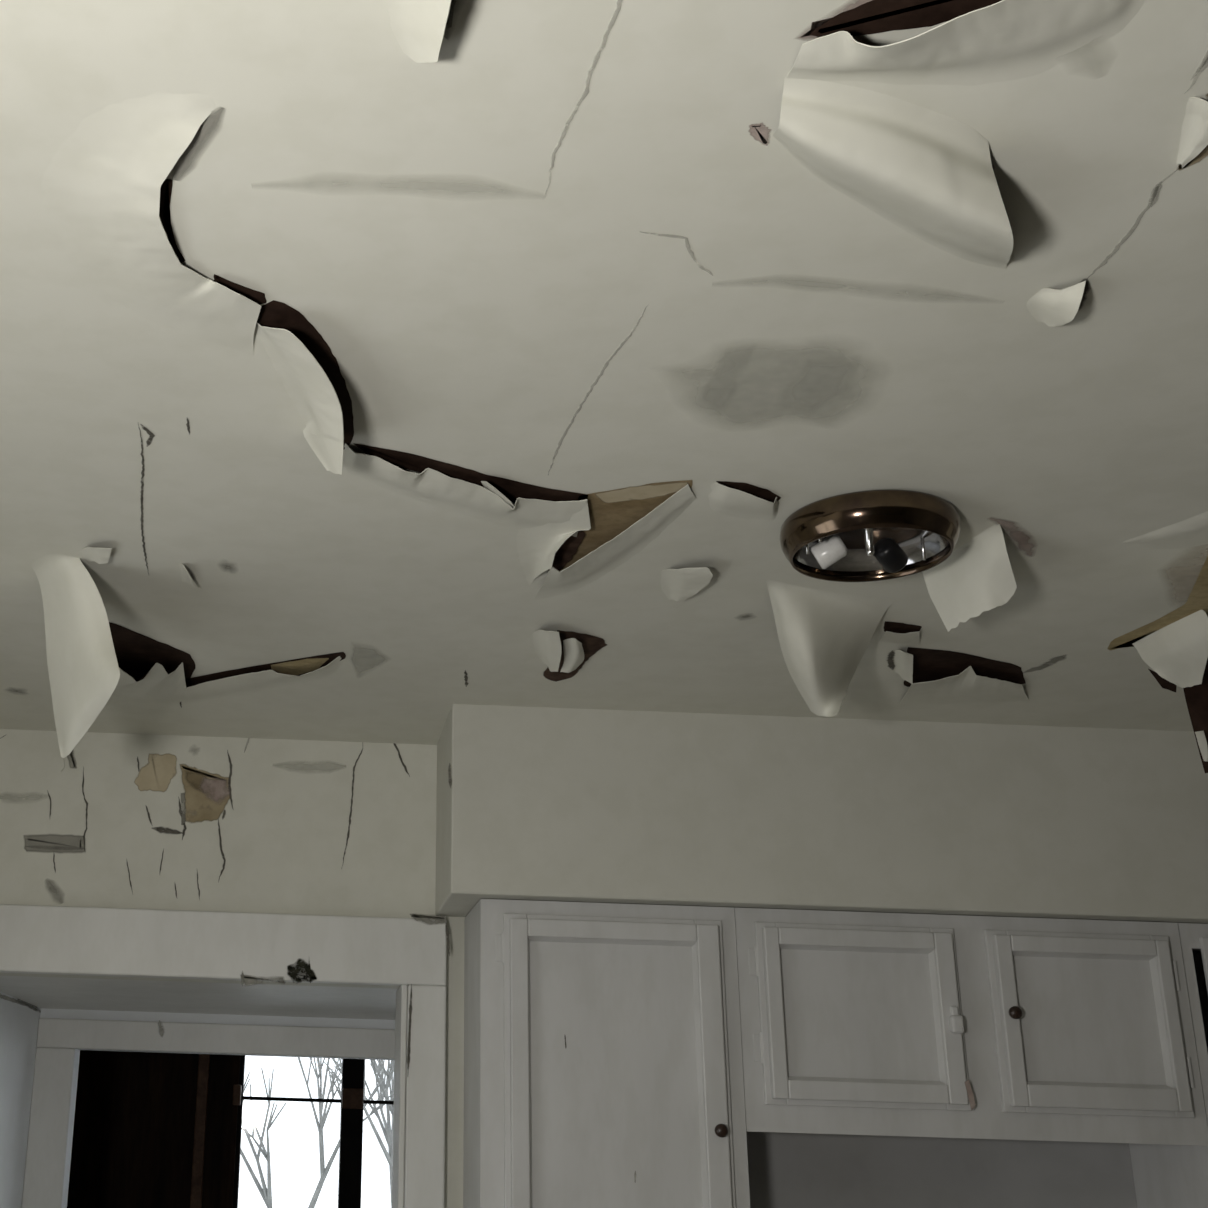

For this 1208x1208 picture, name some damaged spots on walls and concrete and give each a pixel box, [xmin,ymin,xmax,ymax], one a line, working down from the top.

peeling [387,0,457,63]
crack [552,0,622,166]
peeling [749,0,1145,269]
peeling [41,91,781,601]
damp [692,349,857,421]
crack [138,424,155,574]
peeling [30,547,346,771]
peeling [765,578,1065,717]
peeling [922,518,1034,632]
crack [81,766,89,849]
crack [146,741,249,900]
crack [342,749,363,866]